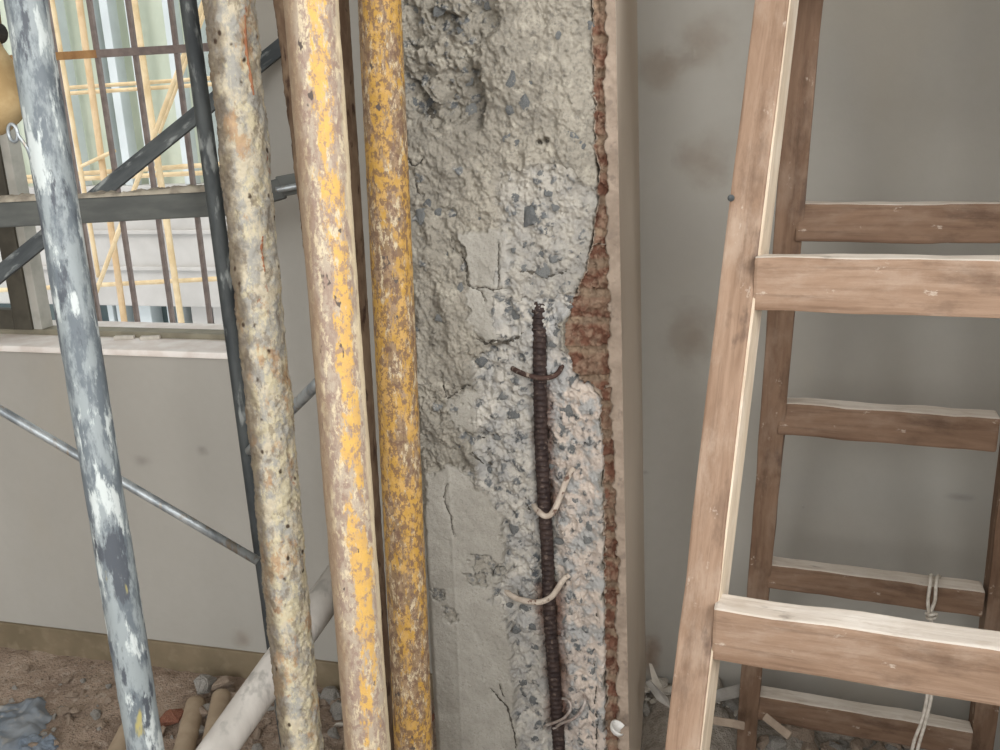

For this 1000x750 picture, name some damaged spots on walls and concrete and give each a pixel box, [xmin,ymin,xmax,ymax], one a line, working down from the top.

crack [451,237,567,301]
spalling [415,0,620,750]